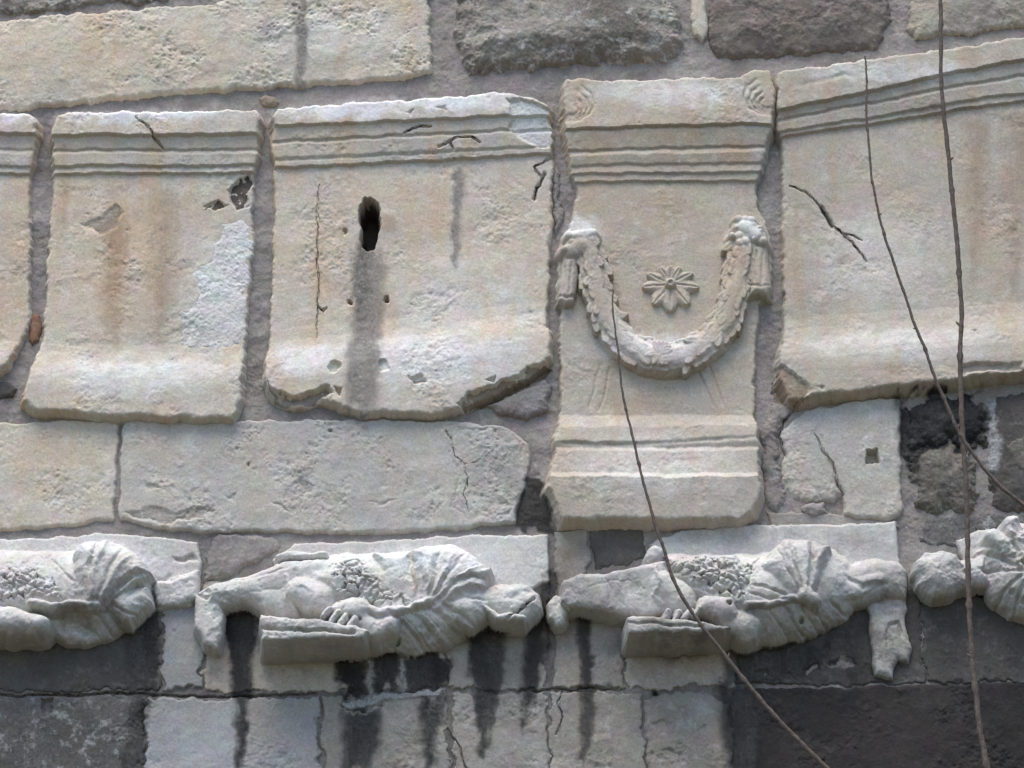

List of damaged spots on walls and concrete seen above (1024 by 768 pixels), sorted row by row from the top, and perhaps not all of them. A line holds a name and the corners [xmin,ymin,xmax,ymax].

spalling [169,176,256,349]
crack [404,124,479,149]
damp [452,158,463,261]
crack [533,157,547,200]
crack [790,186,864,259]
damp [348,243,382,420]
damp [225,610,259,767]
damp [334,652,450,768]
damp [468,624,506,756]
damp [521,569,557,704]
damp [576,617,594,759]